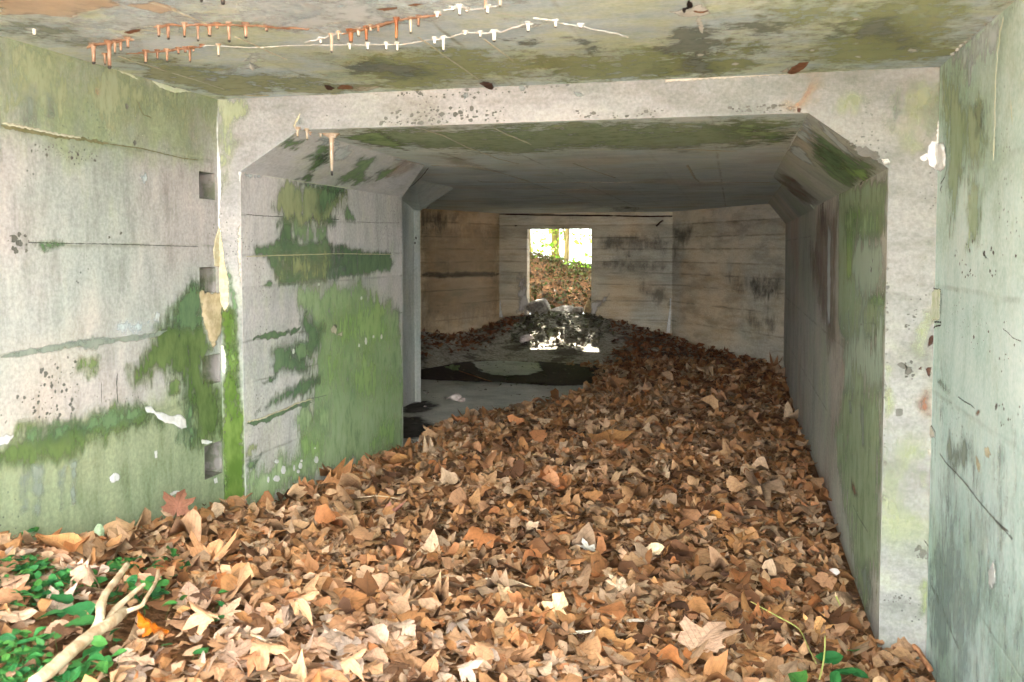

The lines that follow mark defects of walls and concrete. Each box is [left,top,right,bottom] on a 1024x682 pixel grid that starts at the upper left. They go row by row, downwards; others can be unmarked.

leakage [1,1,211,48]
leakage [219,0,446,32]
leakage [152,80,191,93]
leakage [952,17,1004,161]
leakage [277,133,402,244]
leakage [253,326,312,362]
leakage [813,203,884,446]
leakage [0,373,212,446]
leakage [247,401,312,426]
leakage [267,447,319,483]
crack [940,454,1013,540]